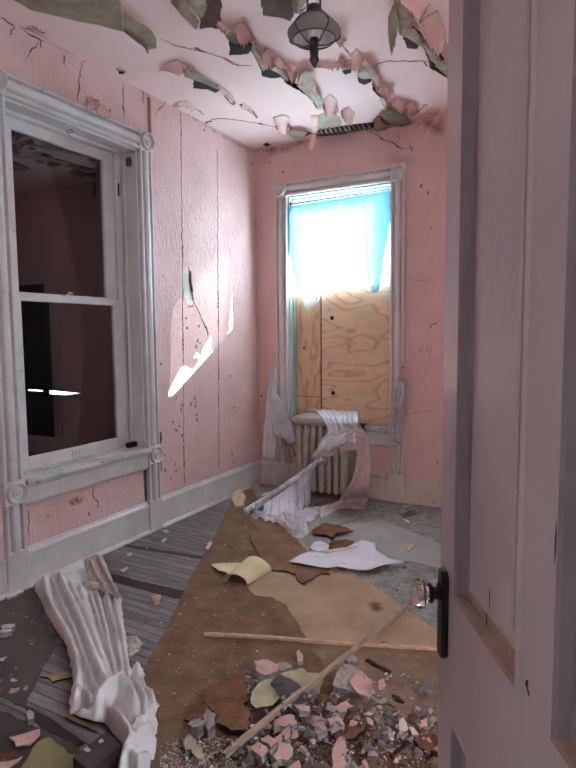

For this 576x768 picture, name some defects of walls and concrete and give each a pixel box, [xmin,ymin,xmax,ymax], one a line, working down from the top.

crack [1,18,42,56]
crack [160,38,252,66]
crack [63,55,85,101]
peeling [158,0,448,164]
peeling [182,266,194,306]
crack [122,84,273,484]